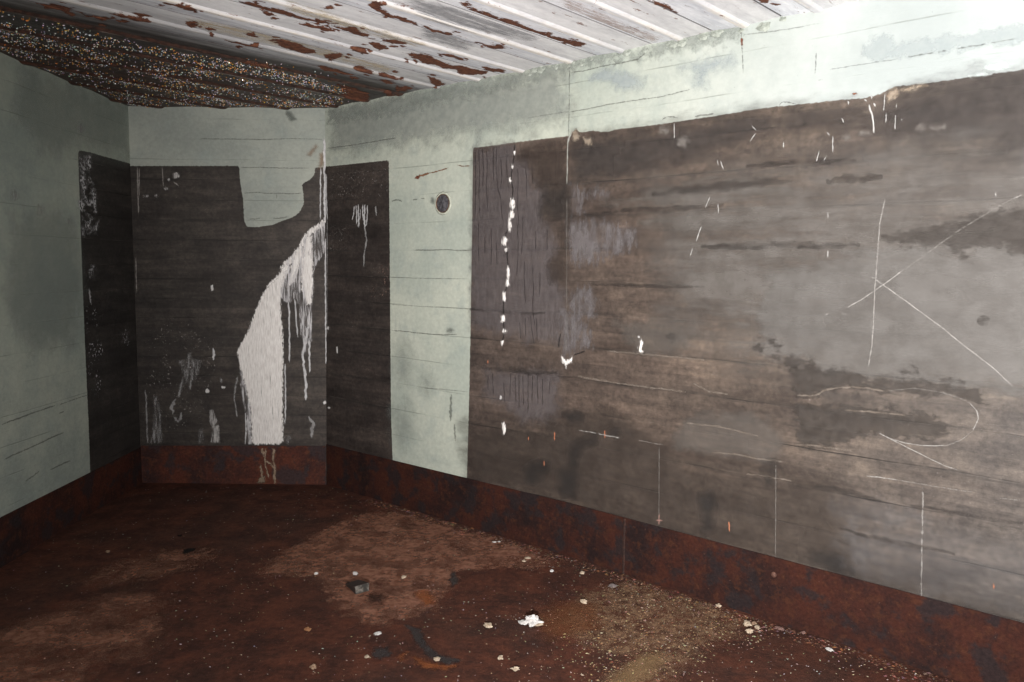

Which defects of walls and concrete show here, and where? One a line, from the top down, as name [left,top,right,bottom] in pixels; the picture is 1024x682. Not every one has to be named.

rust [226,1,506,102]
rust [461,1,585,47]
rust [566,3,654,40]
damp [898,80,1024,142]
damp [567,118,767,264]
damp [221,65,564,484]
damp [657,158,1024,447]
rust [261,499,948,682]